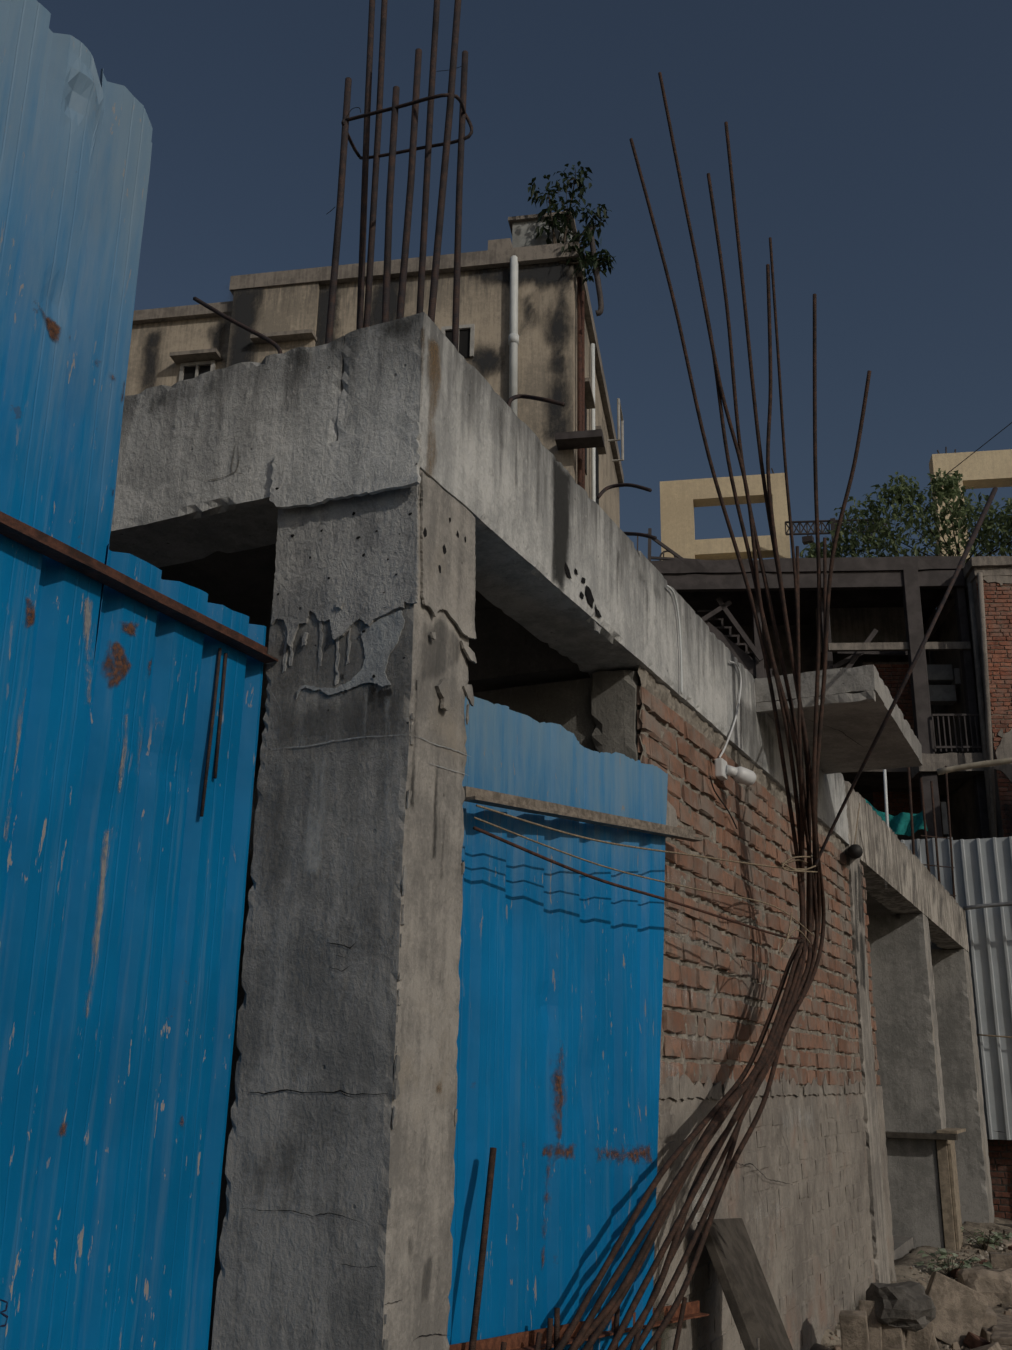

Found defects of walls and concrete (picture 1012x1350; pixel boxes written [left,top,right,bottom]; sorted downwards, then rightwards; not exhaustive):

water stain [143,331,164,402]
water stain [212,287,262,366]
water stain [471,262,570,439]
spalling [507,394,565,407]
rust [26,599,35,626]
flaking render [271,463,477,725]
rust [104,622,137,686]
flaking render [534,72,871,1350]
crack [244,1089,388,1098]
rust [543,1060,573,1173]
crack [242,1208,366,1224]
spalling [468,1147,497,1350]